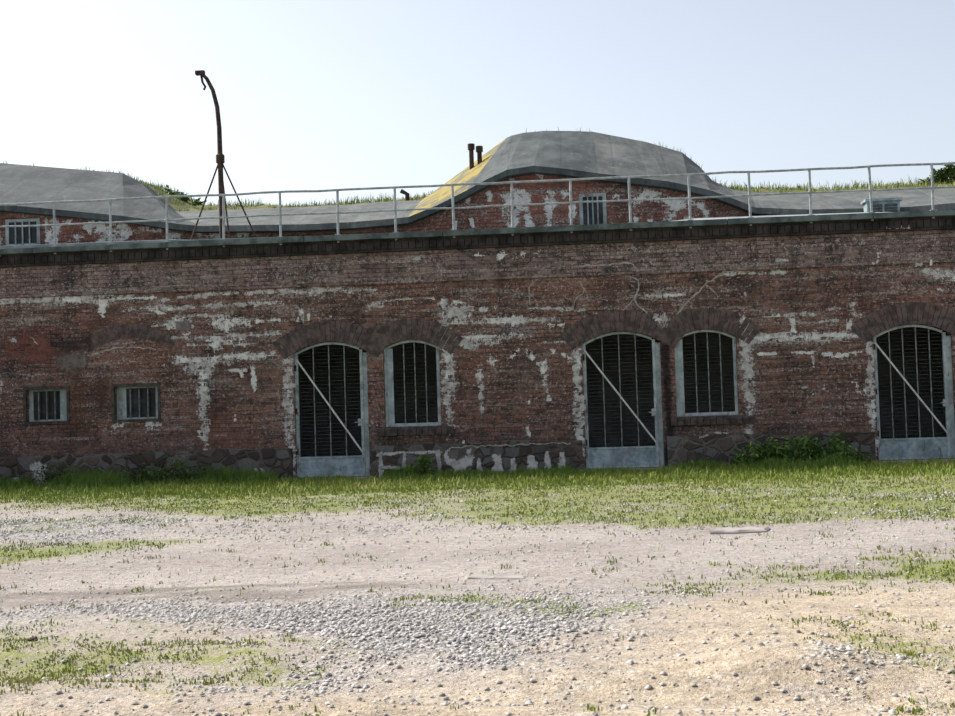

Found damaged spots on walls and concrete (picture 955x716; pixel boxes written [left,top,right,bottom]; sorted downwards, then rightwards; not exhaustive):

peeling [523,210,535,227]
peeling [559,189,577,220]
peeling [205,322,247,354]